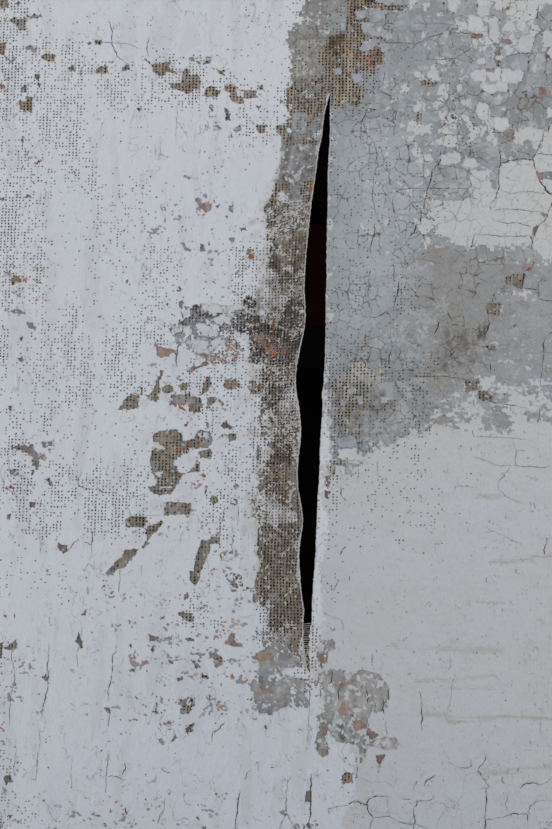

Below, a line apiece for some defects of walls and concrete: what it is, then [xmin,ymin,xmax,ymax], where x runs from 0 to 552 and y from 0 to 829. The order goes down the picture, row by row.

peeling [10,14,42,31]
peeling [26,45,56,63]
crack [385,14,492,61]
peeling [468,4,552,84]
peeling [18,74,42,114]
peeling [439,152,479,169]
crack [351,75,552,369]
peeling [464,377,494,402]
crack [308,673,389,732]
peeling [314,639,400,766]
crack [280,774,435,829]
crack [462,757,551,829]